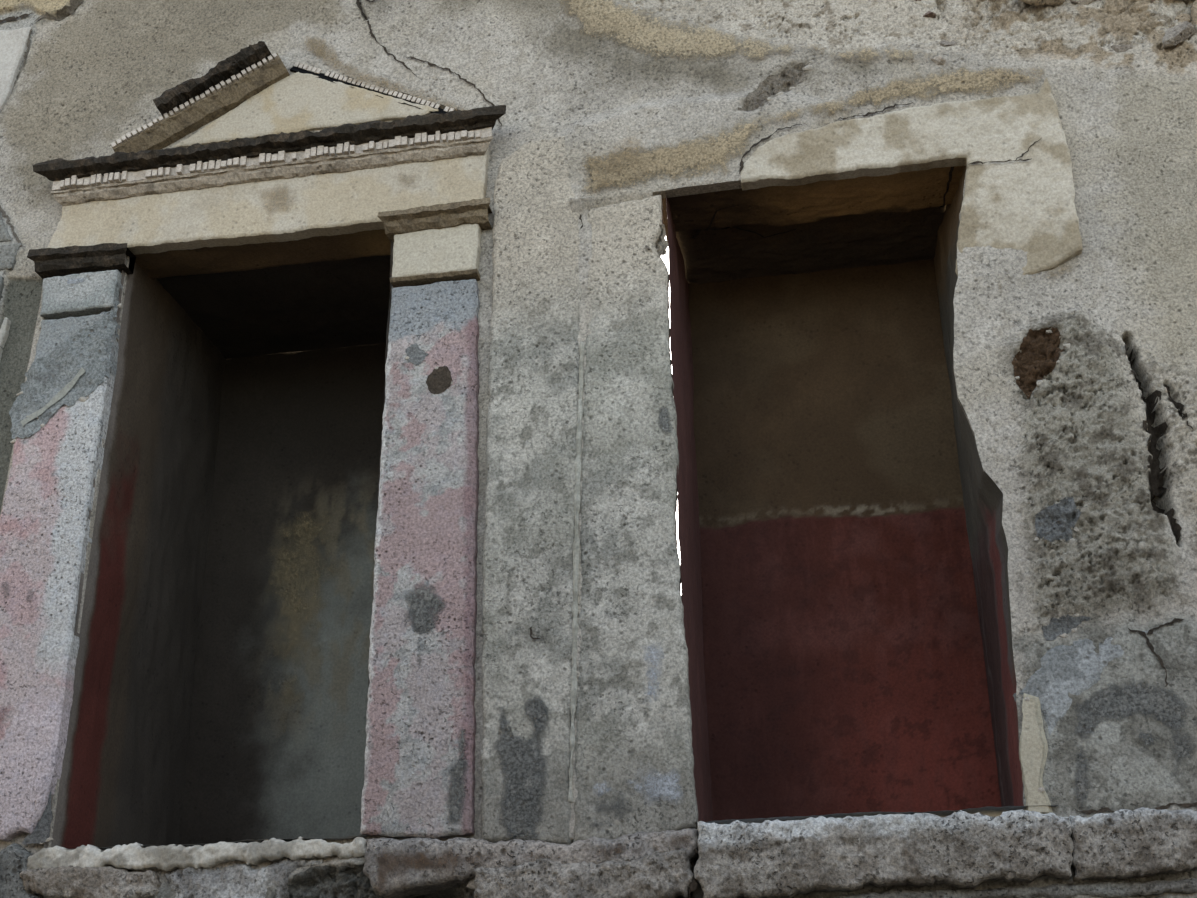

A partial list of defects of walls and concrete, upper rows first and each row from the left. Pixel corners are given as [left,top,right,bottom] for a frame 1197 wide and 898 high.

crack [356,0,502,126]
flaking render [738,60,814,112]
flaking render [405,343,453,394]
flaking render [1011,327,1070,399]
crack [1125,345,1193,545]
leakage [406,584,445,633]
leakage [494,696,547,841]